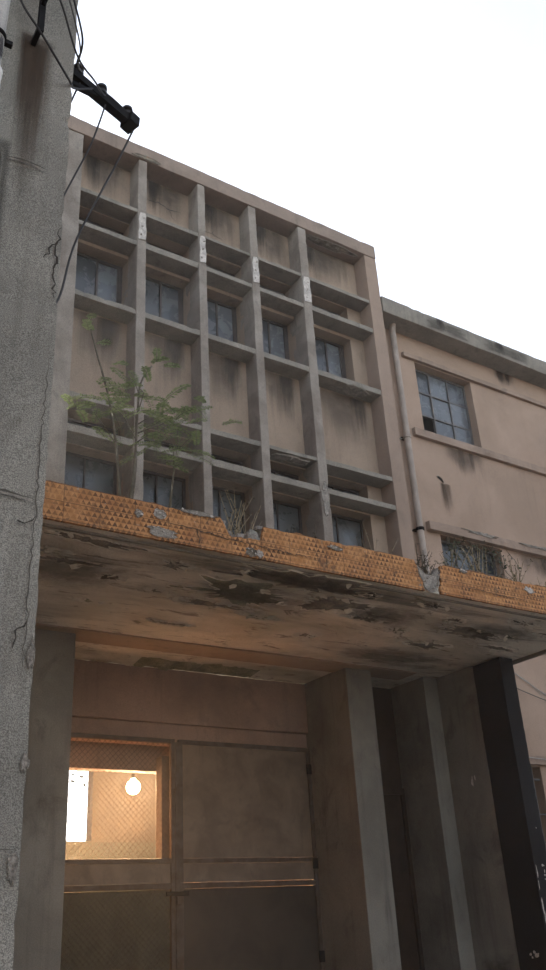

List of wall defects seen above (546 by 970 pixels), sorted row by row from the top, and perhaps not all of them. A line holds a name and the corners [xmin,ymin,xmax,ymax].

crack [43,228,61,298]
crack [0,358,49,676]
peeling [409,563,461,611]
peeling [396,624,519,651]